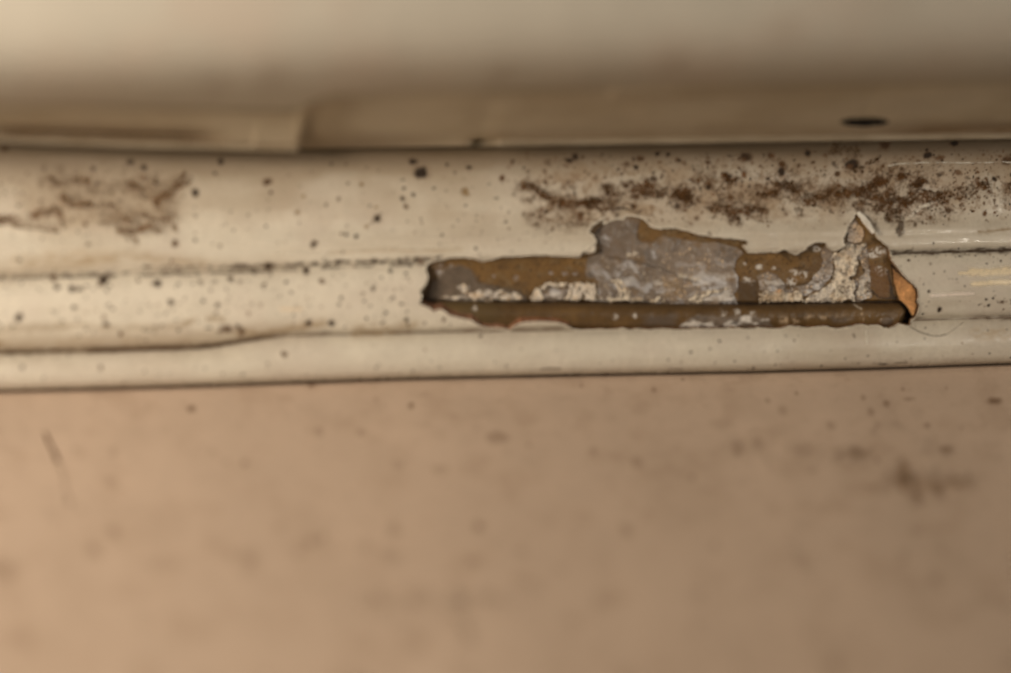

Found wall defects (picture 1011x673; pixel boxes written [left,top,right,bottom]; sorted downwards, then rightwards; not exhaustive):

peeling [417,211,921,331]